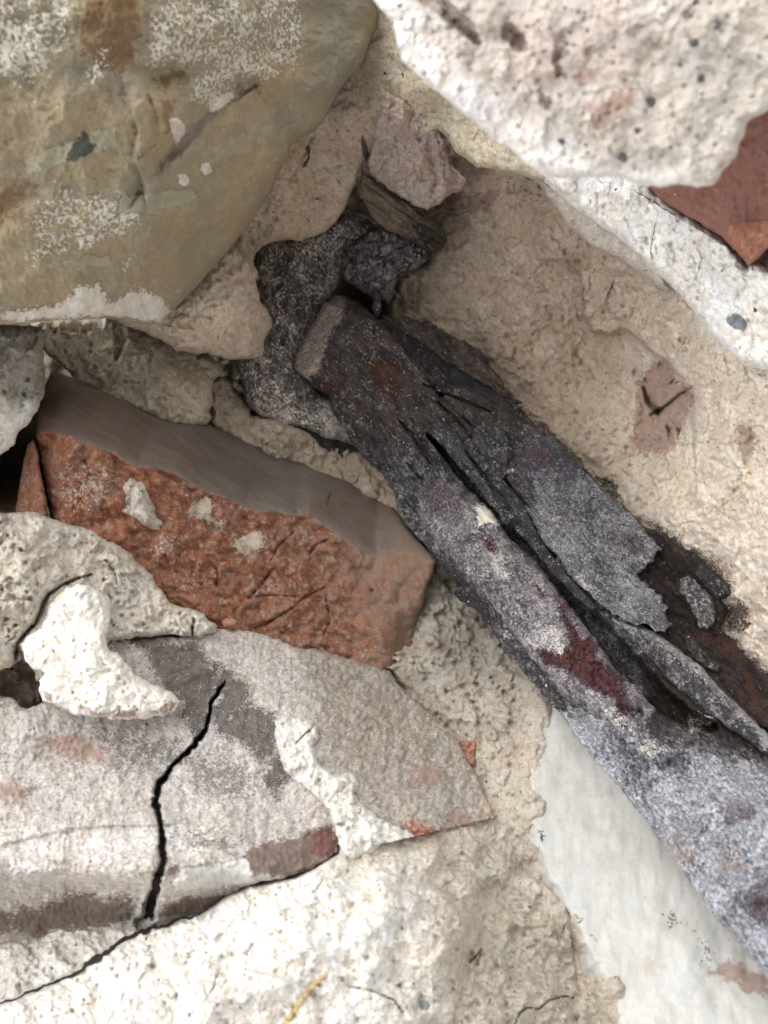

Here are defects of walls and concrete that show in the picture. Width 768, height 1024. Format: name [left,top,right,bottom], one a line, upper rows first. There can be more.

corrosion [533,585,647,729]
crack [0,684,224,1004]